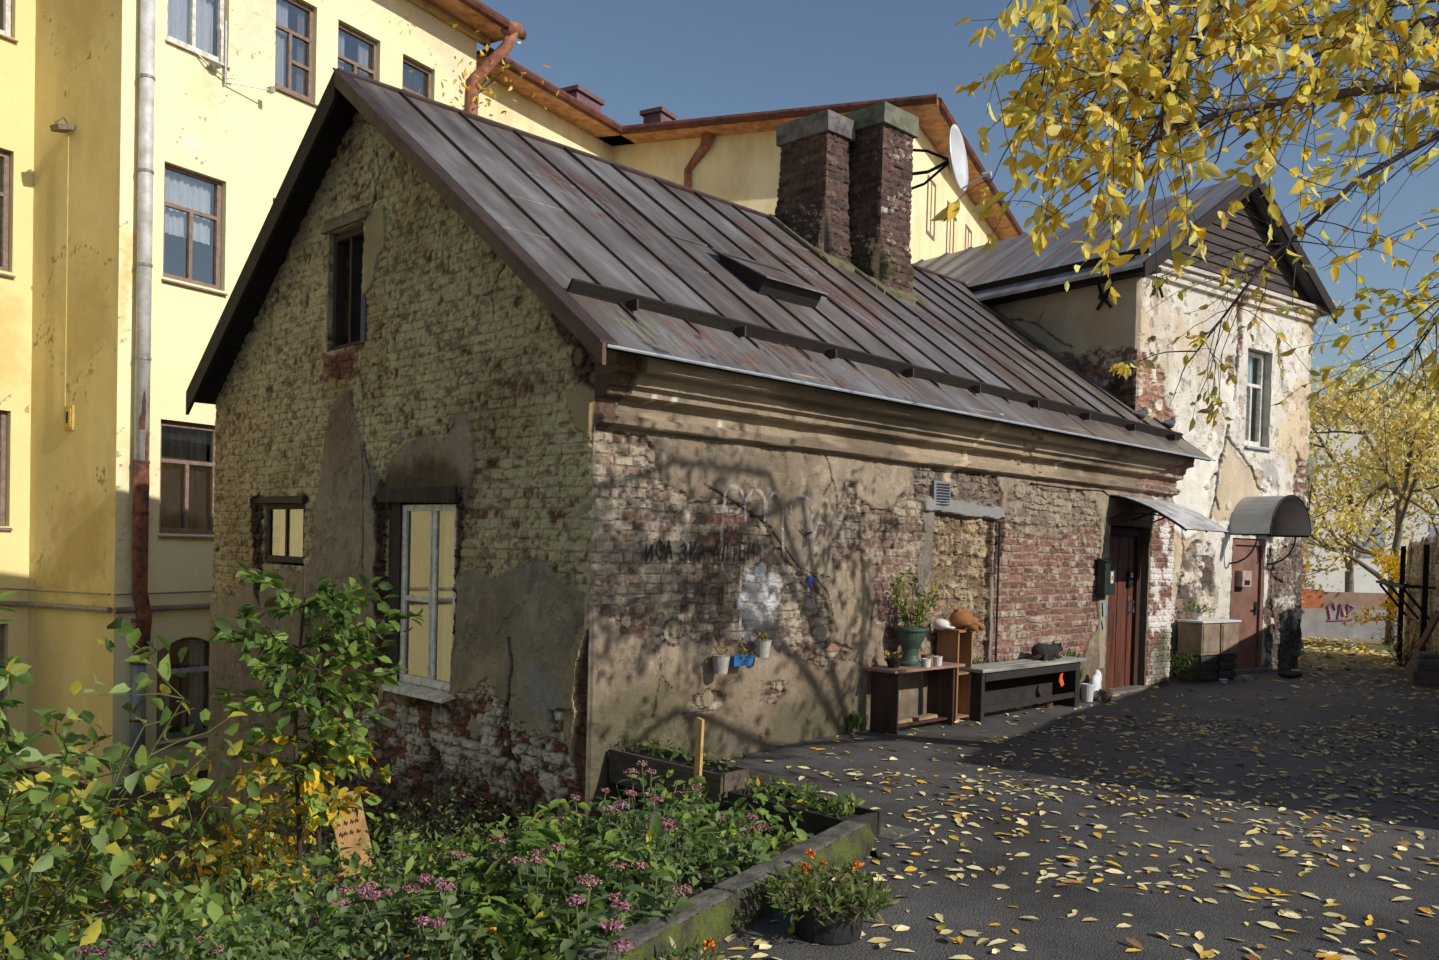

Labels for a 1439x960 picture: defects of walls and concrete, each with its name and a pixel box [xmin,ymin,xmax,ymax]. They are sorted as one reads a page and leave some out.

spalling [551,313,595,390]
flaking render [1055,336,1174,422]
corrosion [115,391,160,588]
flaking render [306,408,850,865]
crack [703,481,834,617]
crack [796,641,871,685]
flaking render [990,461,1102,662]
flaking render [1134,443,1216,686]
flaking render [1212,435,1308,521]
flaking render [1263,537,1304,632]